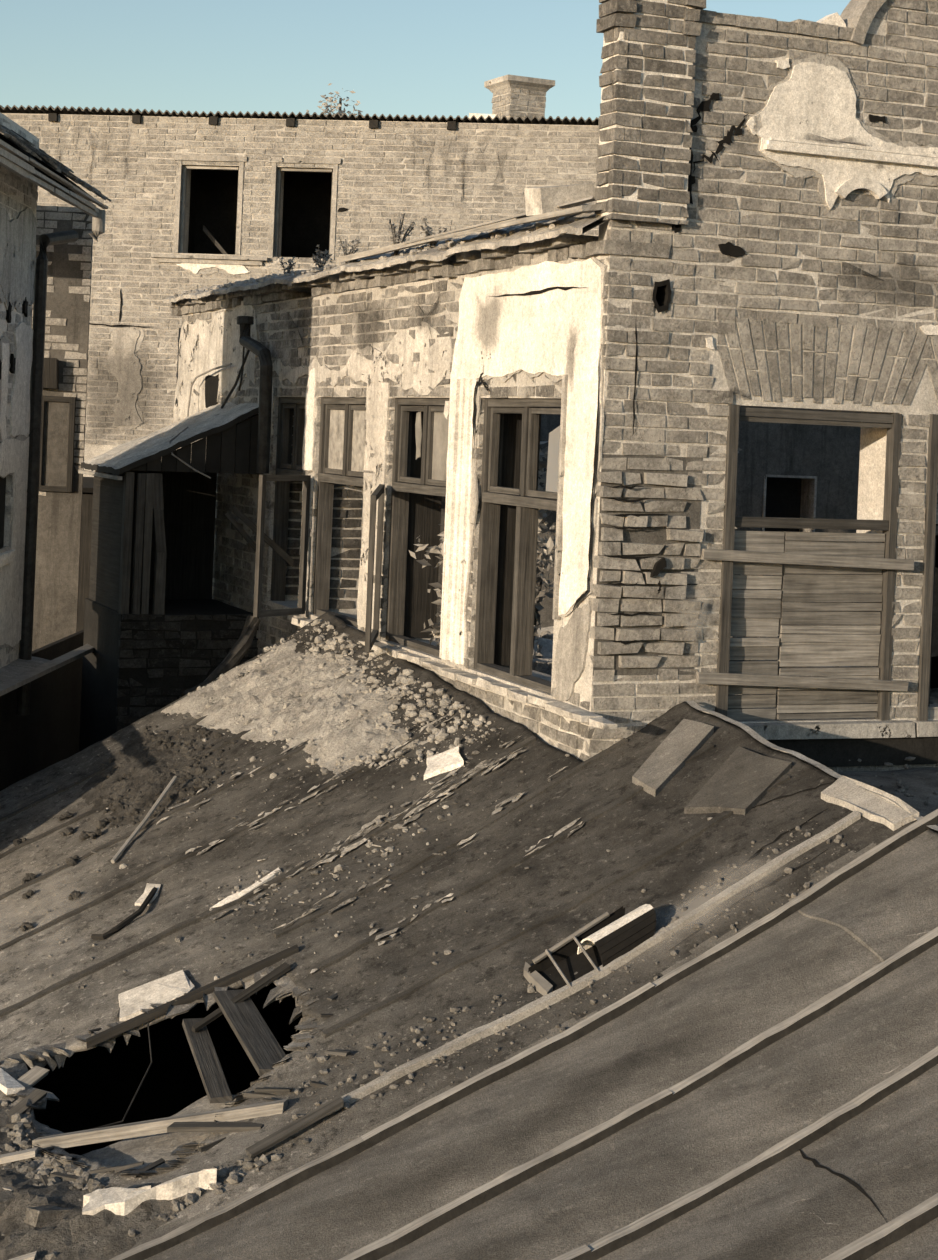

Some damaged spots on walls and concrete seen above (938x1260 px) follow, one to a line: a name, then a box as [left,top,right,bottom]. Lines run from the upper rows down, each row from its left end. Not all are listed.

crack [687,93,749,205]
flaking render [746,54,938,211]
crack [492,286,587,297]
spalling [652,279,671,313]
spalling [718,242,746,257]
flaking render [0,207,37,650]
flaking render [173,253,608,701]
crack [567,361,599,617]
crack [631,314,639,434]
crack [669,781,835,951]
crack [799,1149,887,1222]